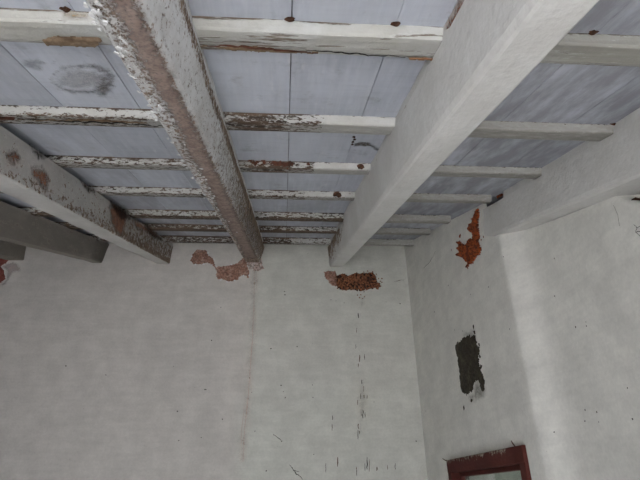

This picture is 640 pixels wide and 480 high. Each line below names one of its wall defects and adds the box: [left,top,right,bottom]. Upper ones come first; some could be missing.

peeling [200,45,318,54]
peeling [0,0,265,284]
peeling [247,160,295,170]
flaking render [451,209,484,269]
flaking render [324,270,383,299]